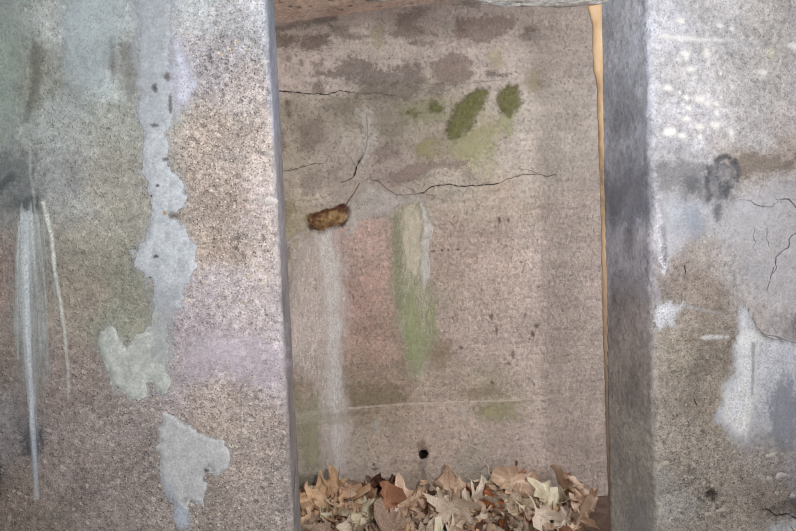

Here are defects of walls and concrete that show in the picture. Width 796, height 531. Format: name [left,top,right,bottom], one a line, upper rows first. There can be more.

crack [279,88,388,96]
leakage [0,157,65,473]
peeling [98,0,198,400]
leakage [287,158,557,467]
crack [297,119,556,205]
leakage [654,290,704,330]
leakage [609,155,796,301]
leakage [700,307,796,445]
crack [753,227,796,289]
peeling [156,412,230,527]